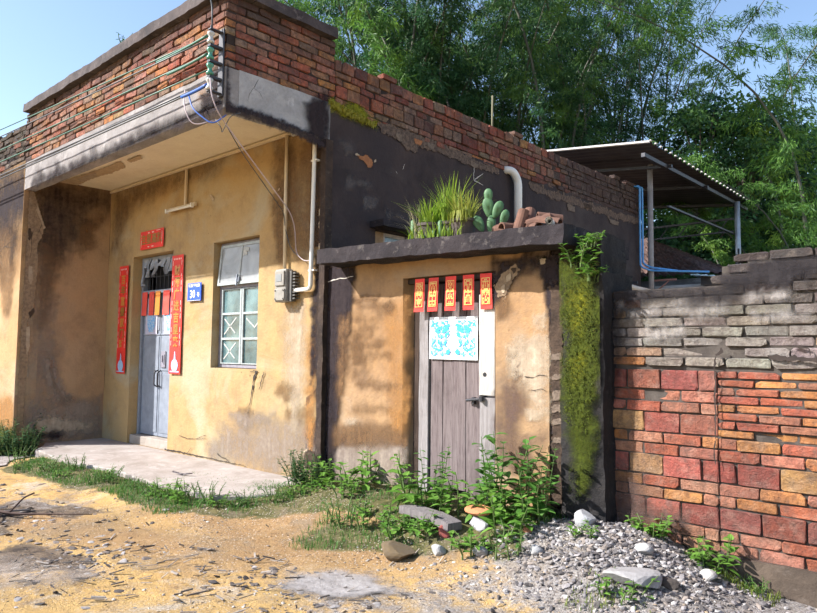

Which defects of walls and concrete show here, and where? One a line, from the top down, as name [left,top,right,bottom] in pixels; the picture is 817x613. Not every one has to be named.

flaking render [355,153,376,168]
flaking render [377,122,499,175]
water stain [0,66,405,486]
flaking render [493,264,520,300]
crack [248,370,264,411]